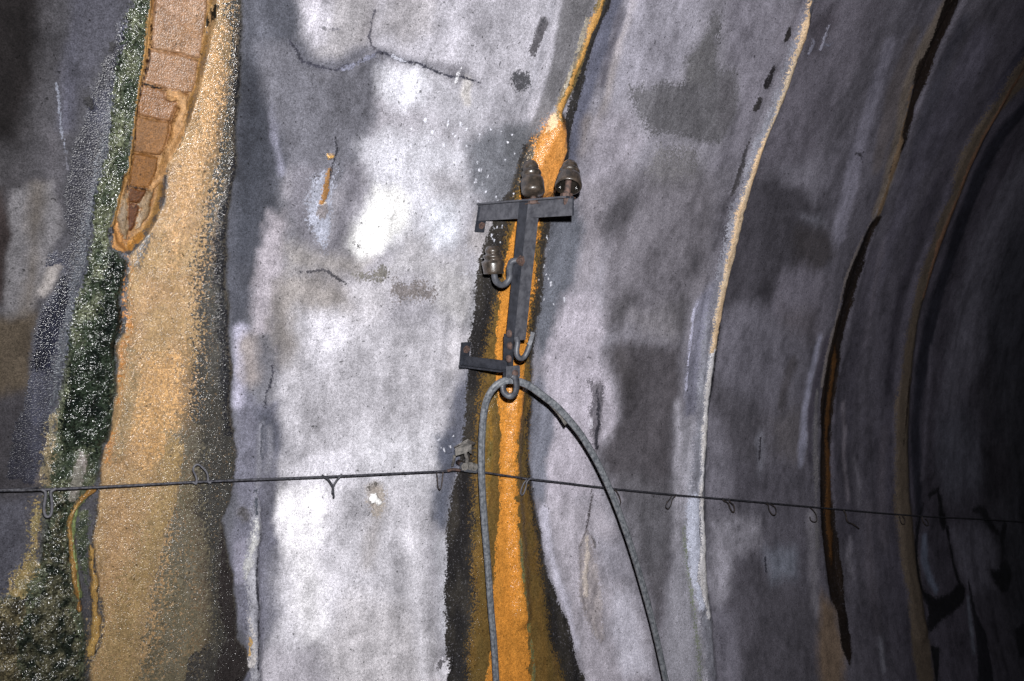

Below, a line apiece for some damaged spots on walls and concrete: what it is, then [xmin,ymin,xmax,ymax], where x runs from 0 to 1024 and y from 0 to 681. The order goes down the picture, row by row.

water stain [3,9,126,487]
water stain [66,484,97,613]
corrosion [79,0,248,681]
spalling [110,0,220,254]
crack [286,7,482,85]
water stain [401,117,516,203]
corrosion [440,217,587,681]
water stain [537,264,566,307]
water stain [623,0,835,681]